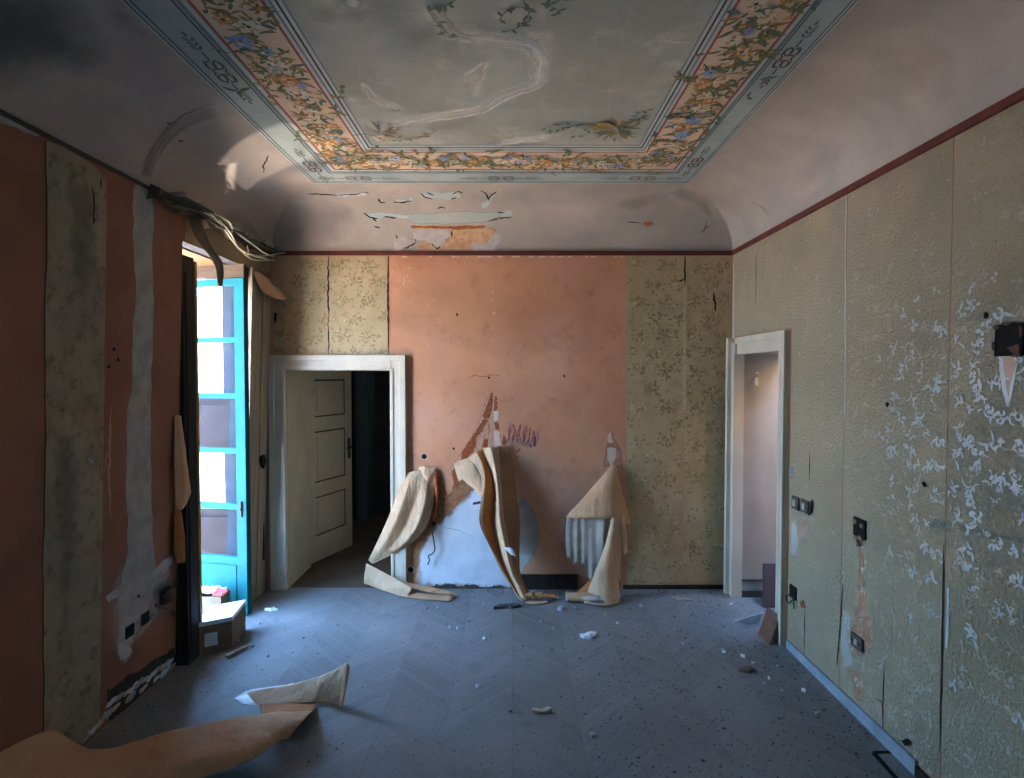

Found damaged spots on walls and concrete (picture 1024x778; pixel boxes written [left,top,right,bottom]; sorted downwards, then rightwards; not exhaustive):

flaking render [364,191,572,285]
flaking render [407,393,512,589]
spalling [125,577,179,640]
flaking render [79,648,176,745]